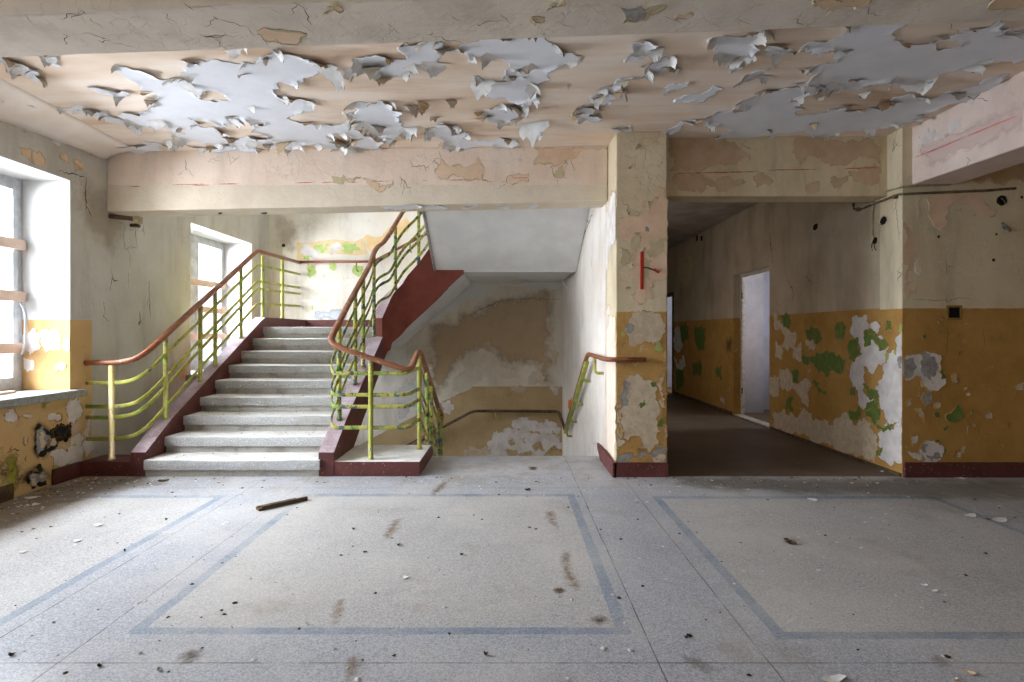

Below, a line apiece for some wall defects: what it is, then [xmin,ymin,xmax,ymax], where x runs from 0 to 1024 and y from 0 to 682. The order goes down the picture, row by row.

peeling [57,0,608,185]
peeling [568,0,1024,188]
peeling [281,204,448,265]
peeling [22,327,70,373]
peeling [586,186,686,463]
peeling [3,408,32,423]
peeling [47,397,95,469]
peeling [441,400,454,415]
peeling [462,417,562,456]
peeling [769,311,971,472]